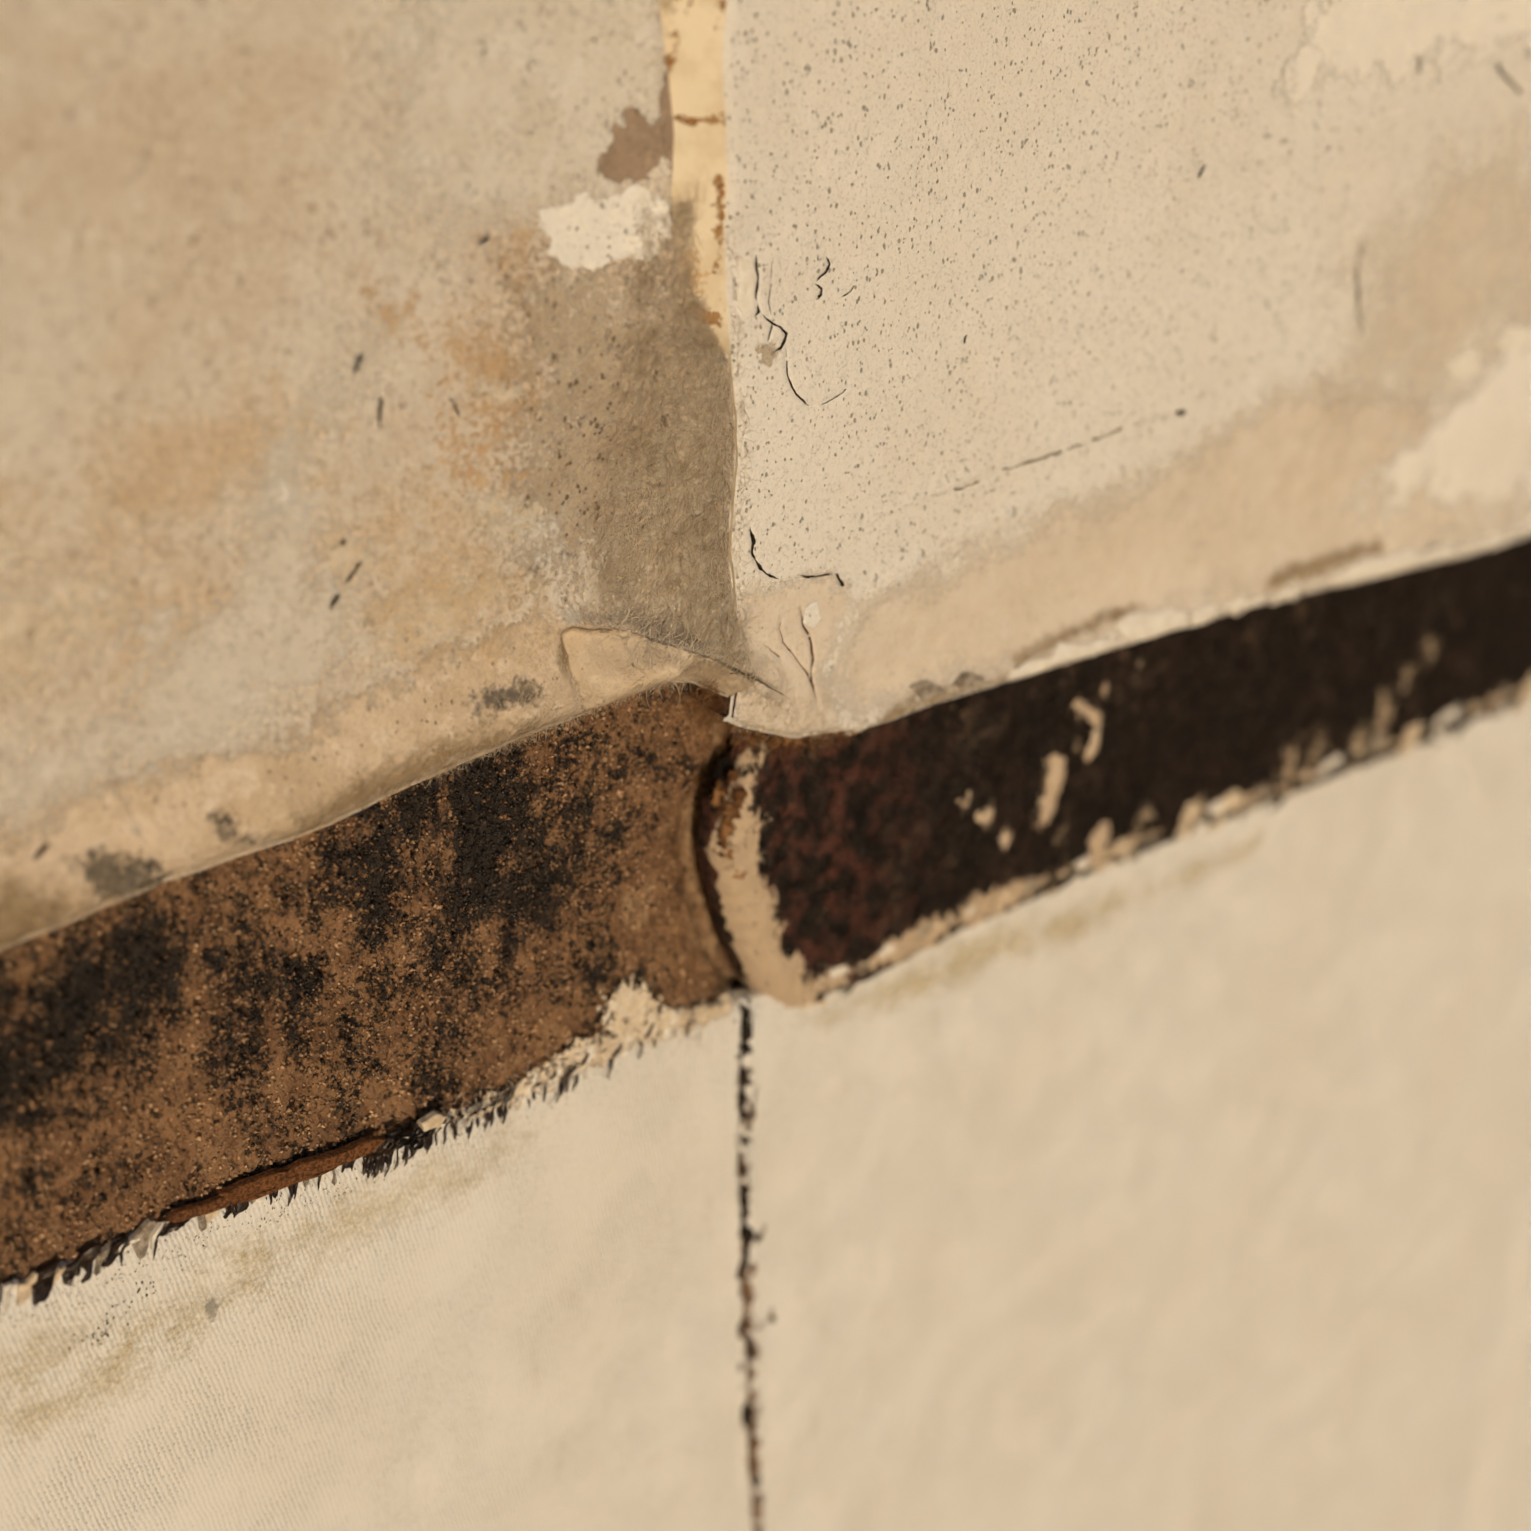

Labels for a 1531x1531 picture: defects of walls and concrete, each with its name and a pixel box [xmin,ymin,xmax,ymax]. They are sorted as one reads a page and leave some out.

rust [674,113,725,126]
spalling [490,58,730,604]
rust [676,175,726,327]
peeling [736,256,756,315]
spalling [330,561,361,609]
peeling [736,318,1531,737]
spalling [33,842,50,861]
spalling [957,790,1013,851]
peeling [991,677,1531,917]
peeling [800,906,974,1010]
peeling [418,968,761,1143]
crack [733,981,776,1531]